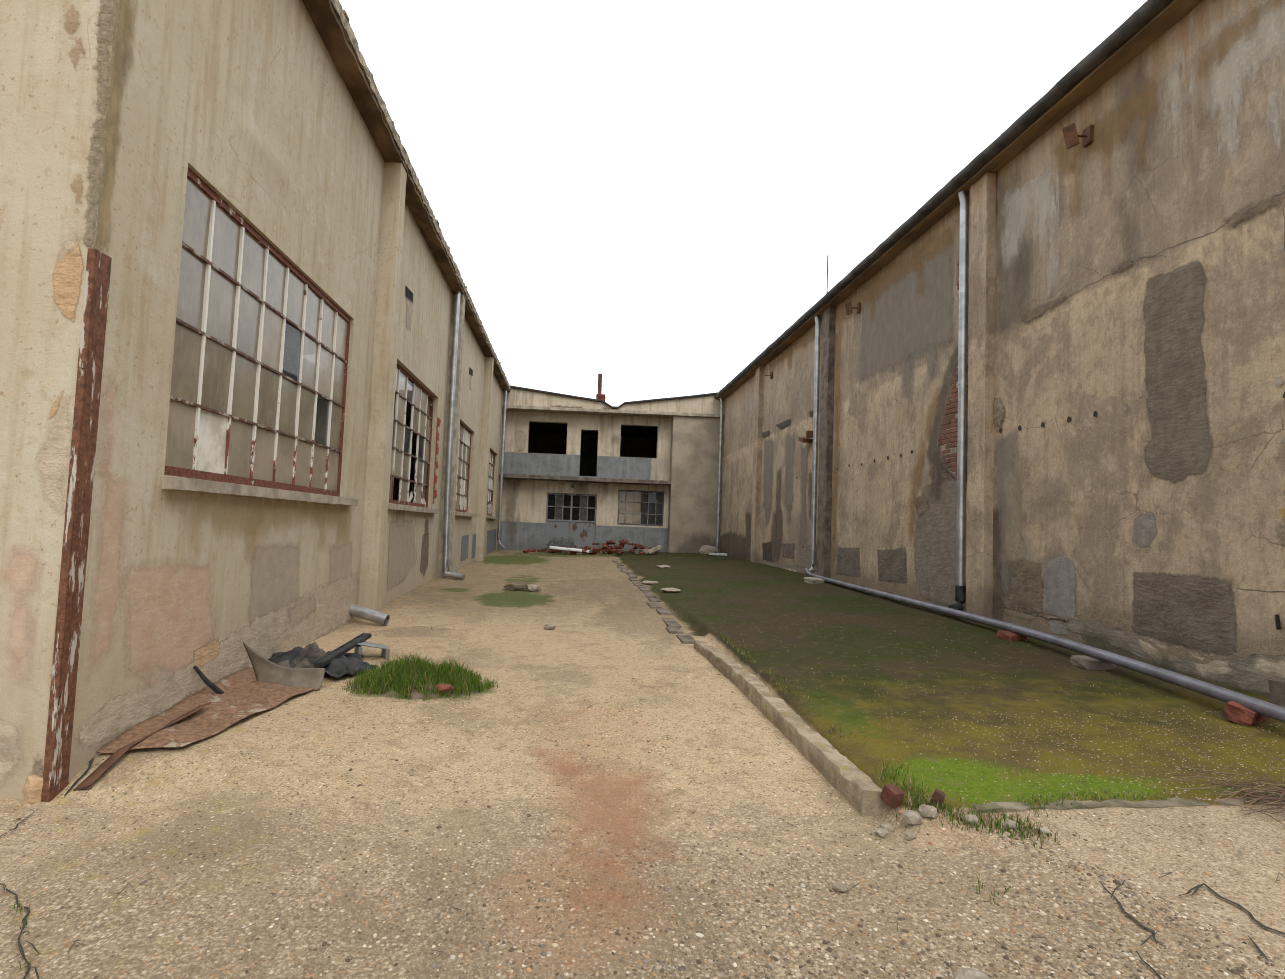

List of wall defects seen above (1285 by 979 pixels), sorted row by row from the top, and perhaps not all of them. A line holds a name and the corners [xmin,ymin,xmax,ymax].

flaking render [53,0,117,322]
crack [1059,222,1227,302]
flaking render [937,348,968,484]